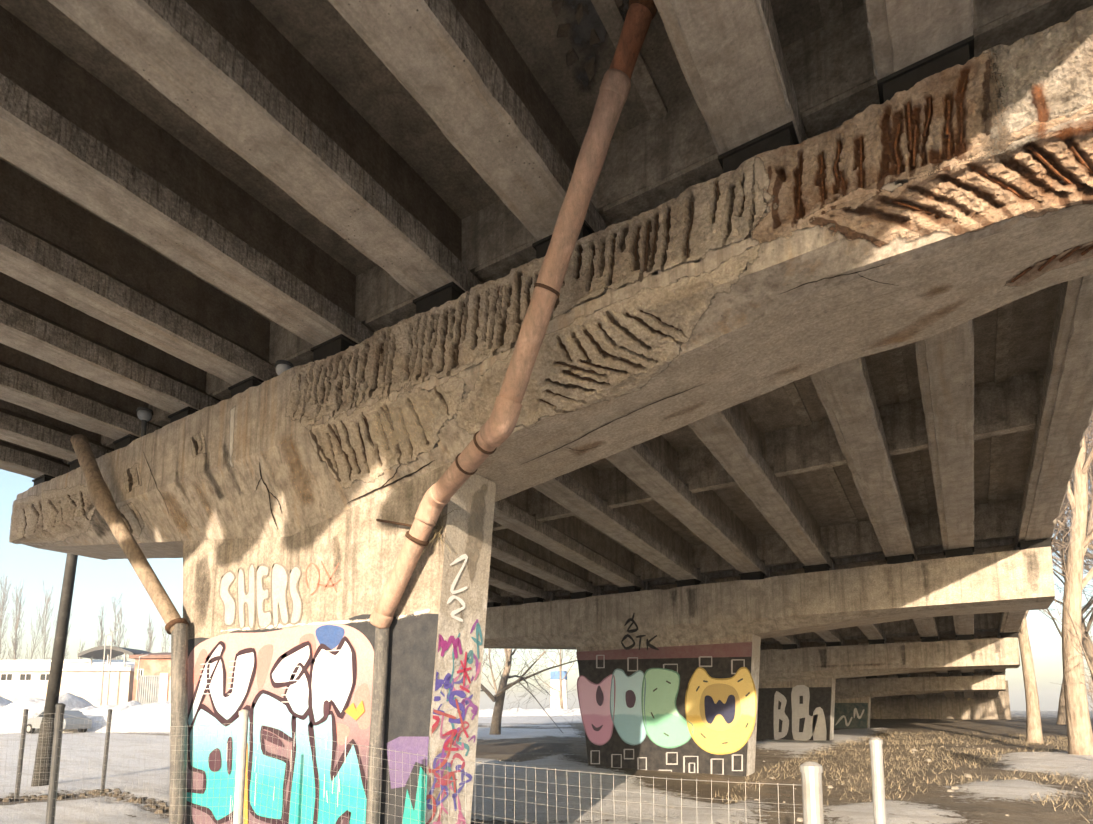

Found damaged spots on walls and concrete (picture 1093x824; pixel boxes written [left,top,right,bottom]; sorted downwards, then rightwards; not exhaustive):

leakage [554,0,608,91]
spalling [516,6,1093,428]
crack [781,263,899,294]
spalling [285,256,545,488]
spalling [9,484,96,544]
crack [256,462,282,530]
crack [347,460,435,504]